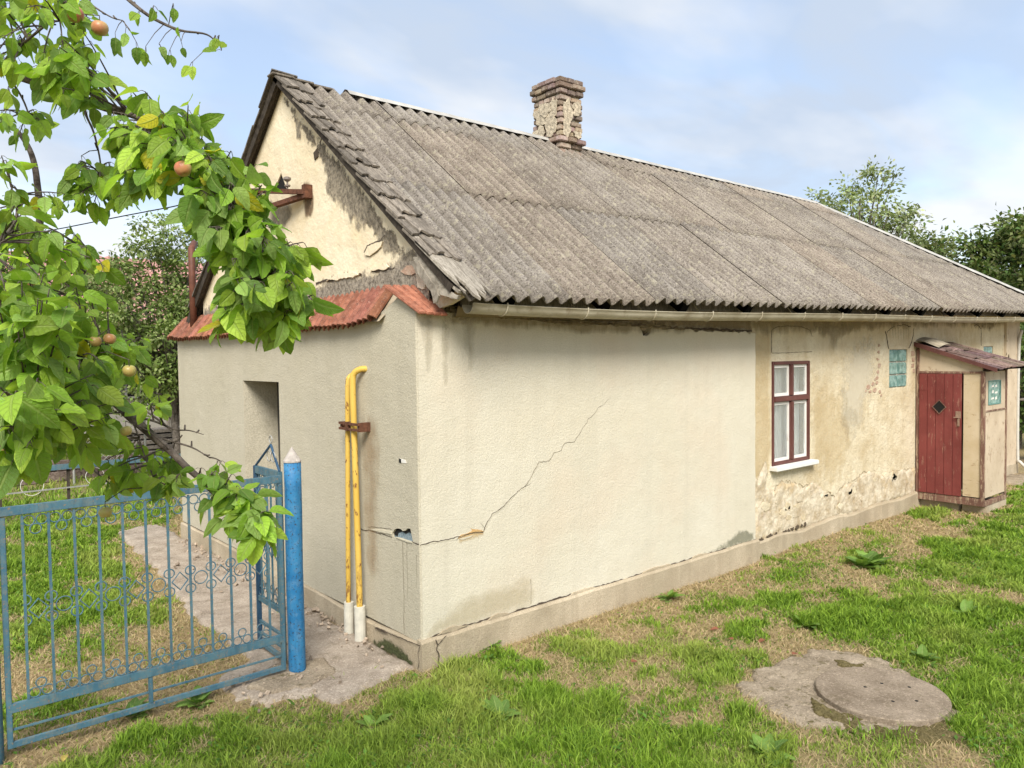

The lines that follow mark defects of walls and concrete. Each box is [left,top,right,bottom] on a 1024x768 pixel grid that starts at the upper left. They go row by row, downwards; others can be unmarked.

rust [304,183,313,216]
peeling [364,235,385,257]
leakage [445,303,1003,342]
crack [402,404,604,592]
peeling [755,462,915,541]
spalling [360,527,419,545]